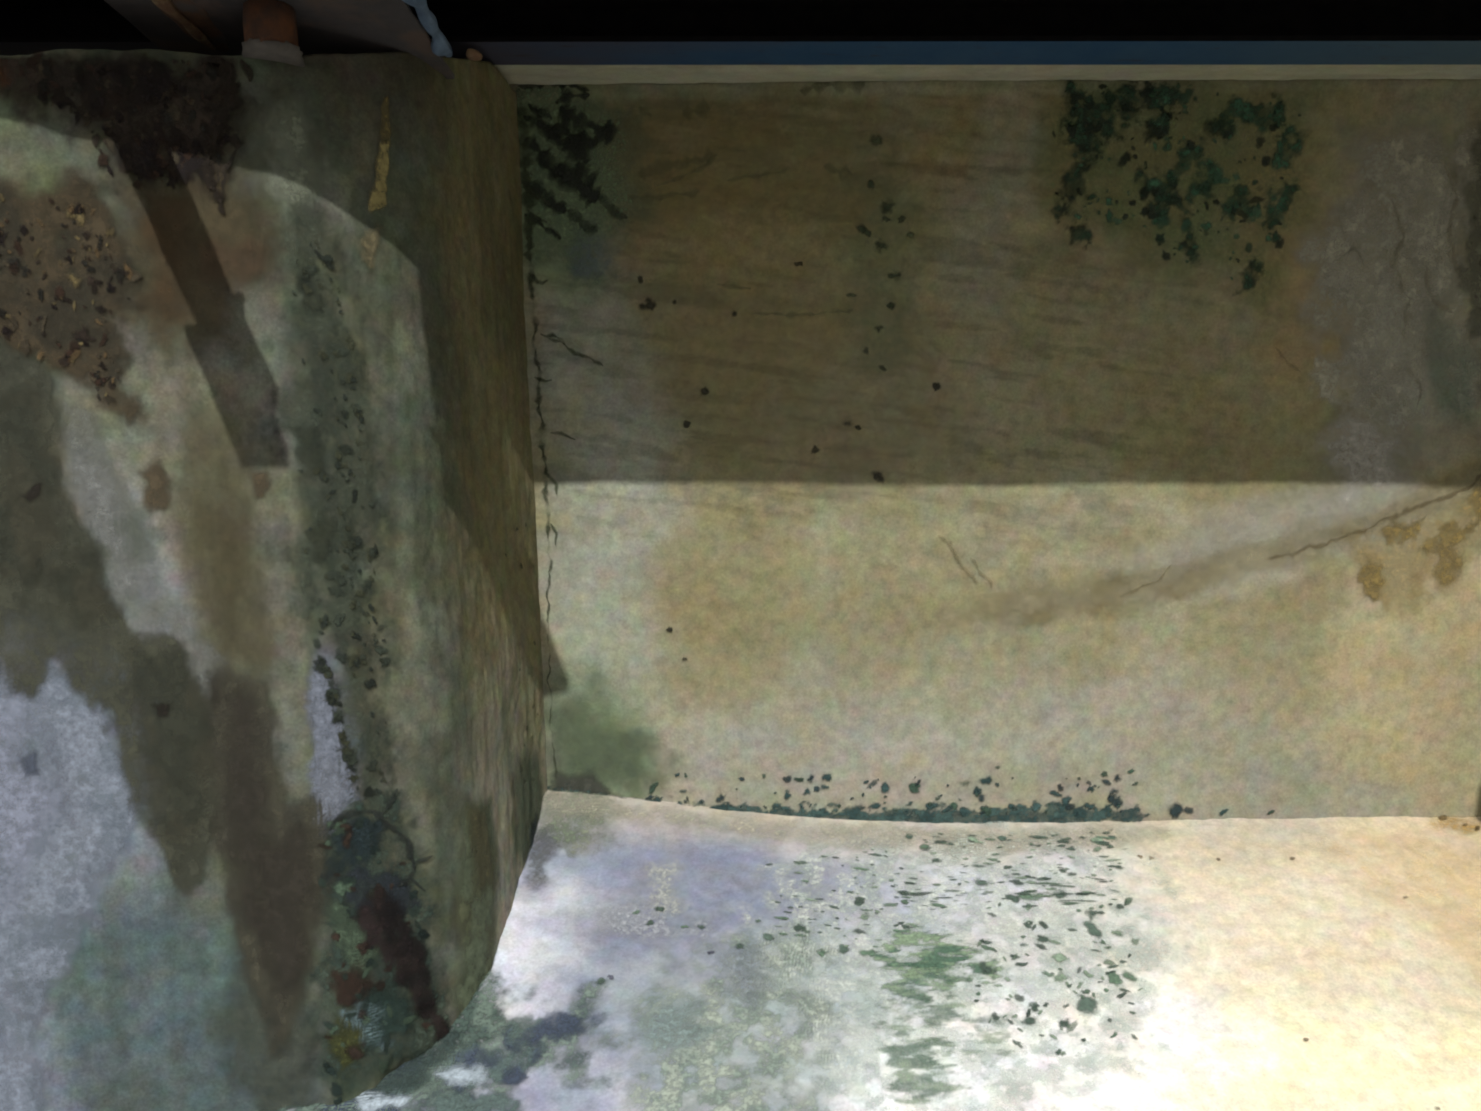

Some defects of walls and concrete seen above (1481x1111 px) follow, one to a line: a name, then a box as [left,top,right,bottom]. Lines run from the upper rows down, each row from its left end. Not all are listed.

leakage [0,105,614,1111]
crack [517,88,603,620]
mould [517,84,648,285]
mould [1047,80,1309,300]
crack [1266,476,1481,559]
leakage [522,766,1193,1111]